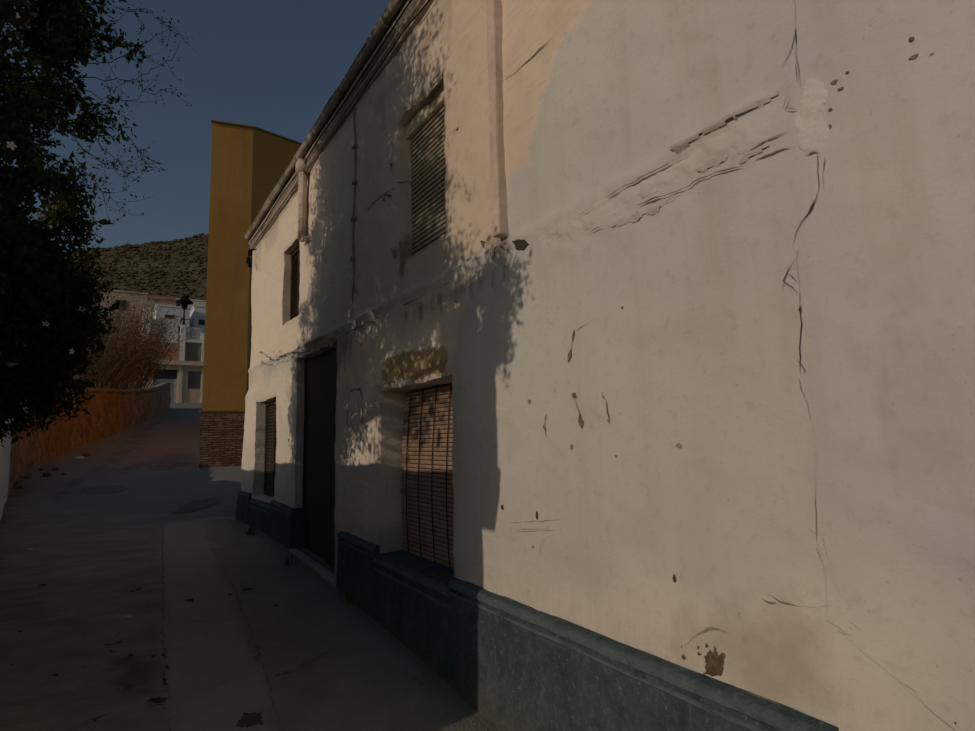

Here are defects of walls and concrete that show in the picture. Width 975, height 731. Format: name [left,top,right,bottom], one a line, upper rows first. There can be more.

crack [742,0,800,109]
flaking render [512,91,788,250]
crack [551,132,825,422]
flaking render [382,345,448,384]
peeling [681,627,726,677]